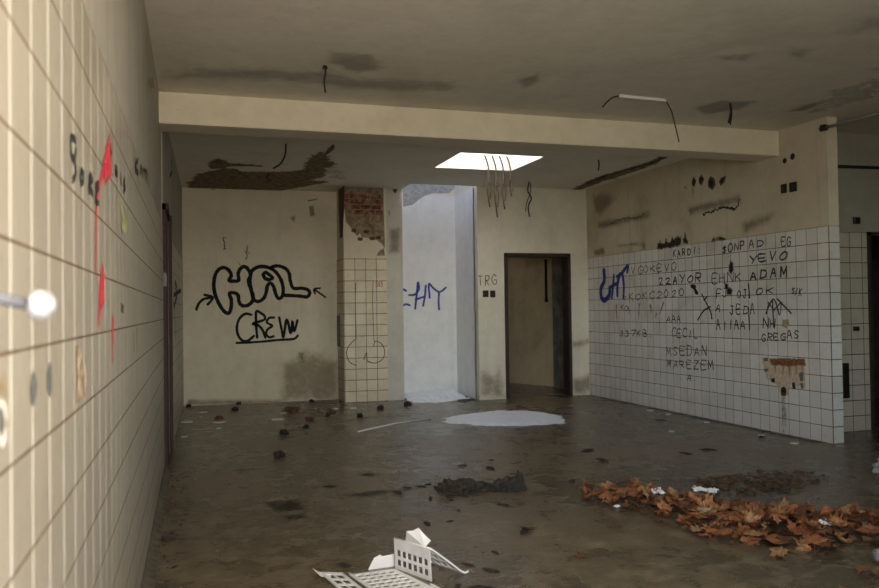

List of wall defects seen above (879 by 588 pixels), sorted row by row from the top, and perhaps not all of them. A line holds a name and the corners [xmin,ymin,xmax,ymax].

flaking render [186,145,338,191]
flaking render [338,184,455,256]